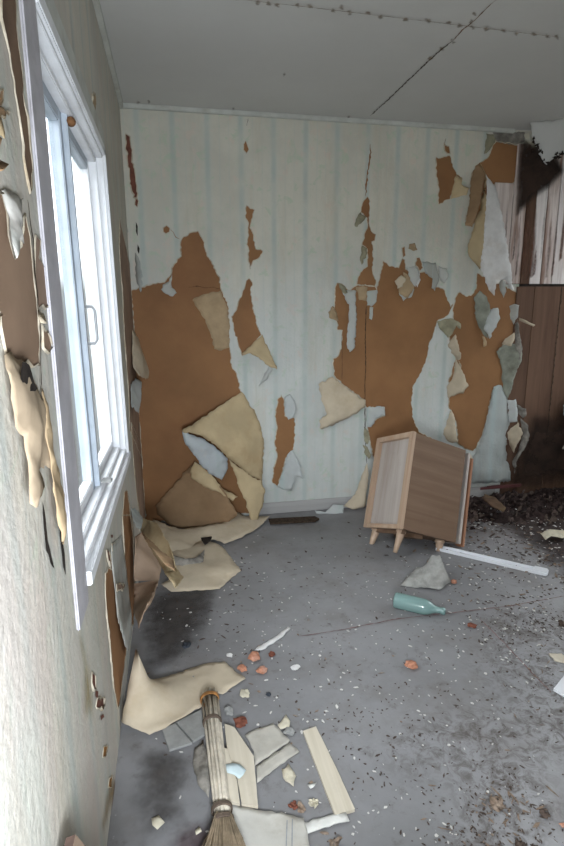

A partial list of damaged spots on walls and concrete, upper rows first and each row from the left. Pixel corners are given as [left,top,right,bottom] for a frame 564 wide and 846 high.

crack [372,0,496,114]
peeling [135,246,143,292]